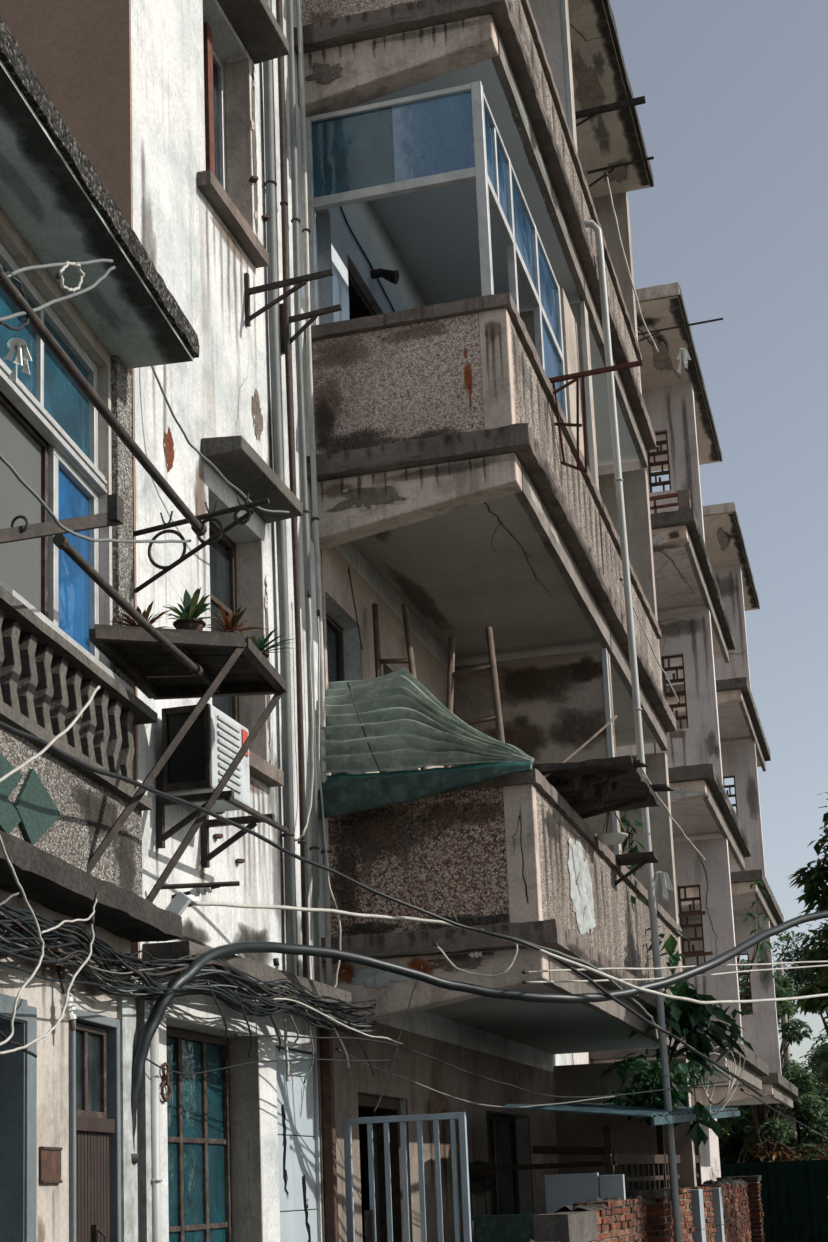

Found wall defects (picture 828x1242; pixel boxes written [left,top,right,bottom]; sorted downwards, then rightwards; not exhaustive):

peeling [305,62,343,84]
water stain [510,0,649,412]
rust [464,347,472,408]
water stain [307,386,485,496]
peeling [327,484,406,512]
crack [484,502,553,598]
crack [512,815,528,903]
peeling [568,834,596,934]
peeling [338,966,409,988]
crack [282,1104,311,1242]